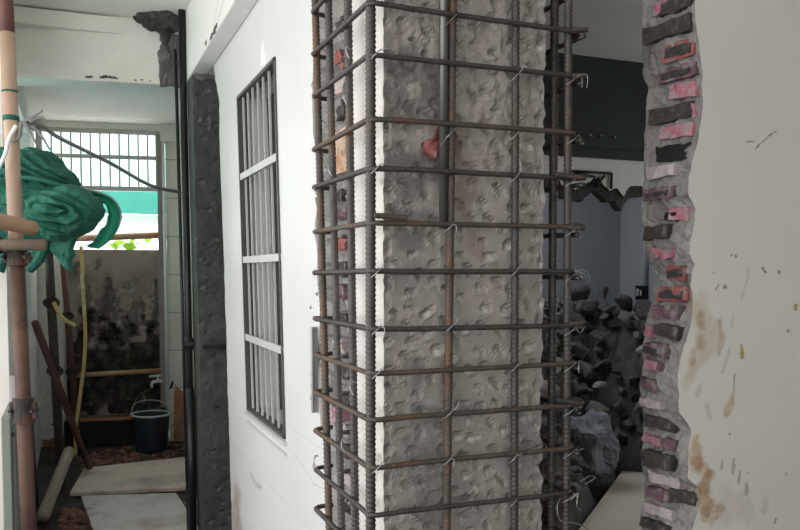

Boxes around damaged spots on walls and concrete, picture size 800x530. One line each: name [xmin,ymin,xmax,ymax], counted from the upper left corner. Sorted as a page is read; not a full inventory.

spalling [133,10,180,88]
spalling [543,0,703,530]
water stain [66,309,161,415]